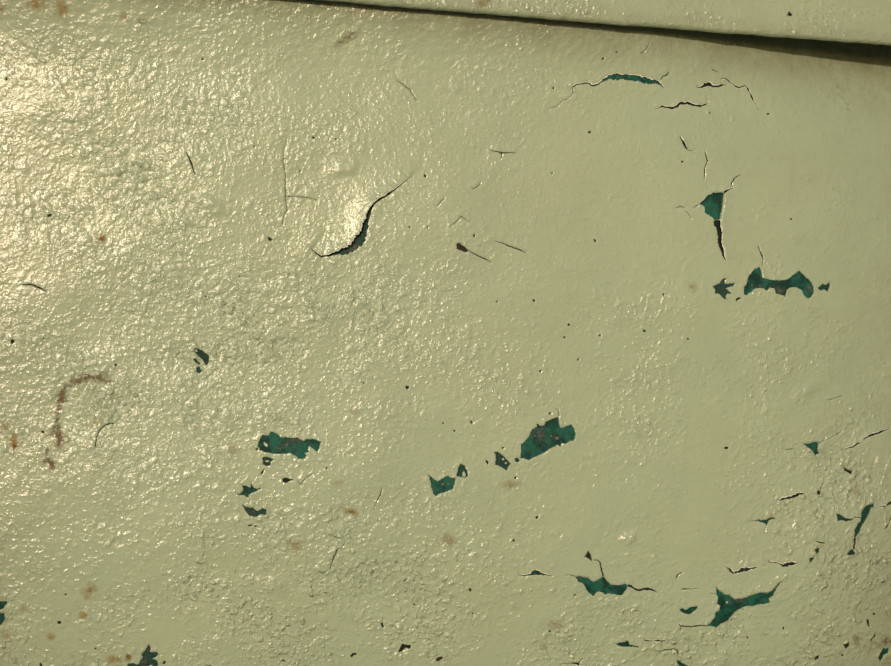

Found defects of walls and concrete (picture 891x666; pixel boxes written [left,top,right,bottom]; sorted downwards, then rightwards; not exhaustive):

crack [546,68,759,113]
peeling [677,176,737,260]
peeling [713,246,830,301]
peeling [256,431,322,475]
peeling [486,411,576,479]
peeling [428,463,469,497]
peeling [237,483,267,527]
peeling [571,551,656,596]
peeling [679,579,785,629]
peeling [127,644,166,666]